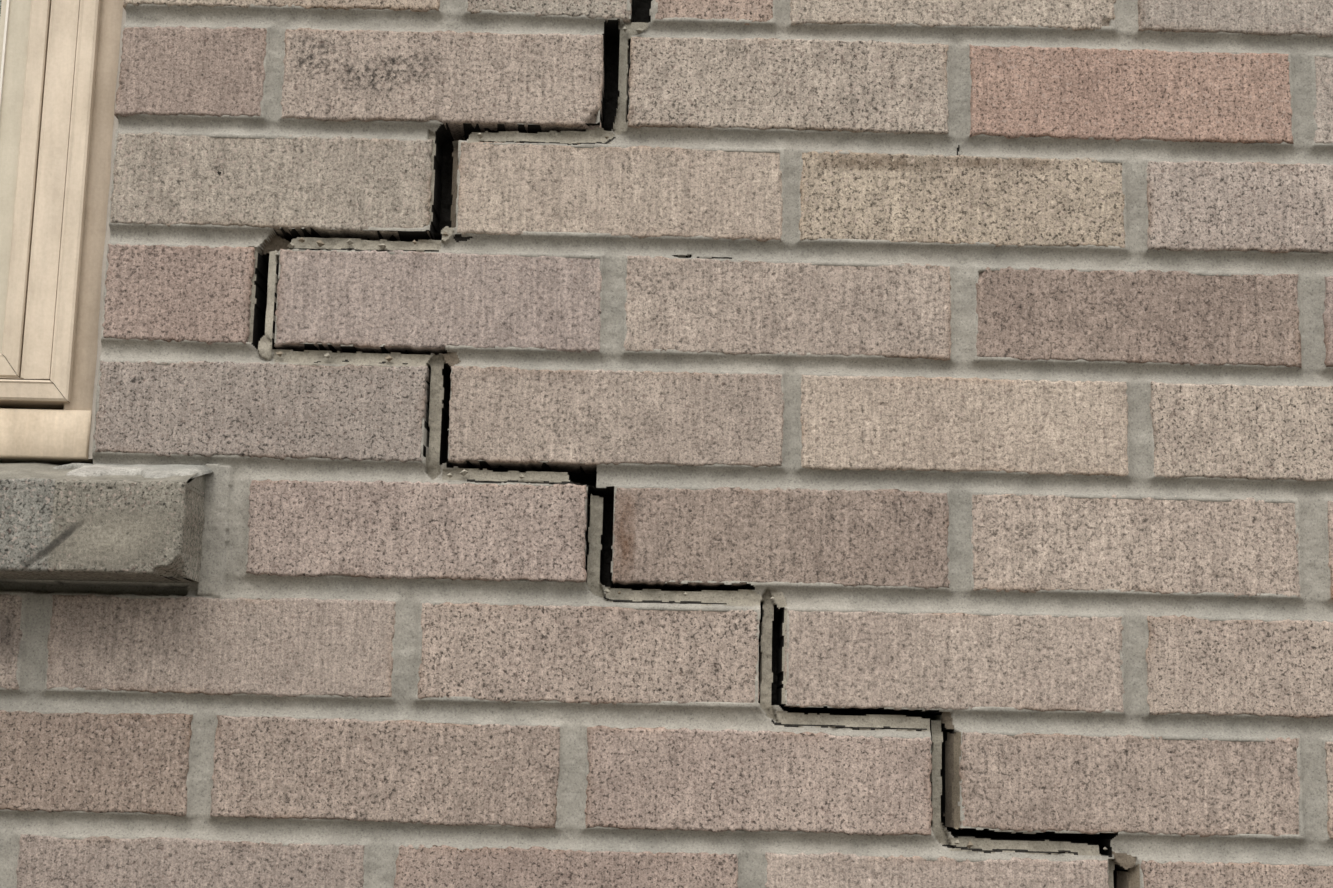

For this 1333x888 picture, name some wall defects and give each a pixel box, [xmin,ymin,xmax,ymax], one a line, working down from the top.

crack [248,0,1140,888]